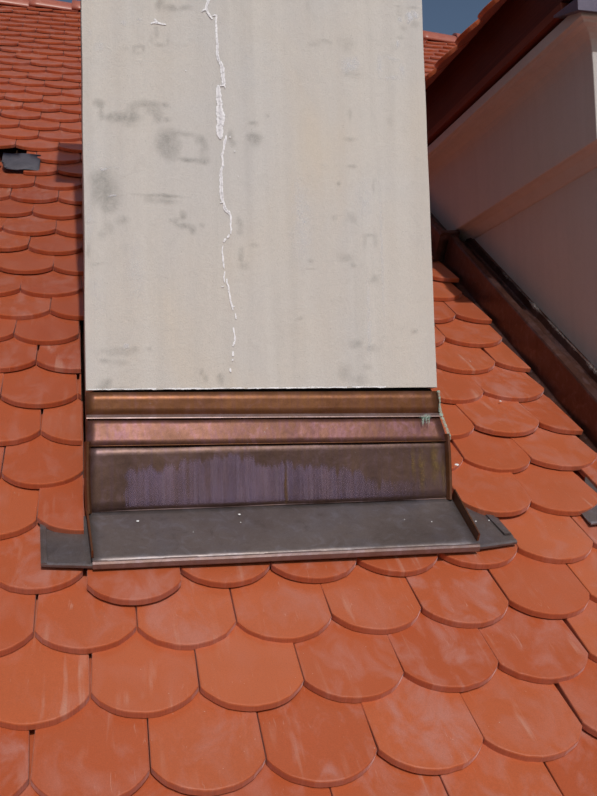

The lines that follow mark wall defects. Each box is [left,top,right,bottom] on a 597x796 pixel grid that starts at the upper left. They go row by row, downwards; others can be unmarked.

crack [201,0,239,372]